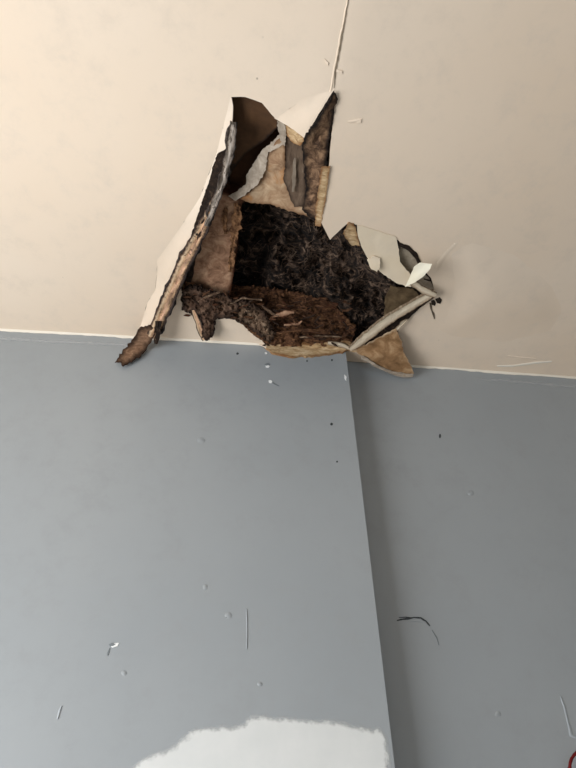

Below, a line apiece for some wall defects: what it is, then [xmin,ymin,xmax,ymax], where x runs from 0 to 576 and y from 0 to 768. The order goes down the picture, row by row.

crack [324,0,349,93]
peeling [357,225,411,287]
spalling [348,278,442,351]
crack [397,617,439,645]